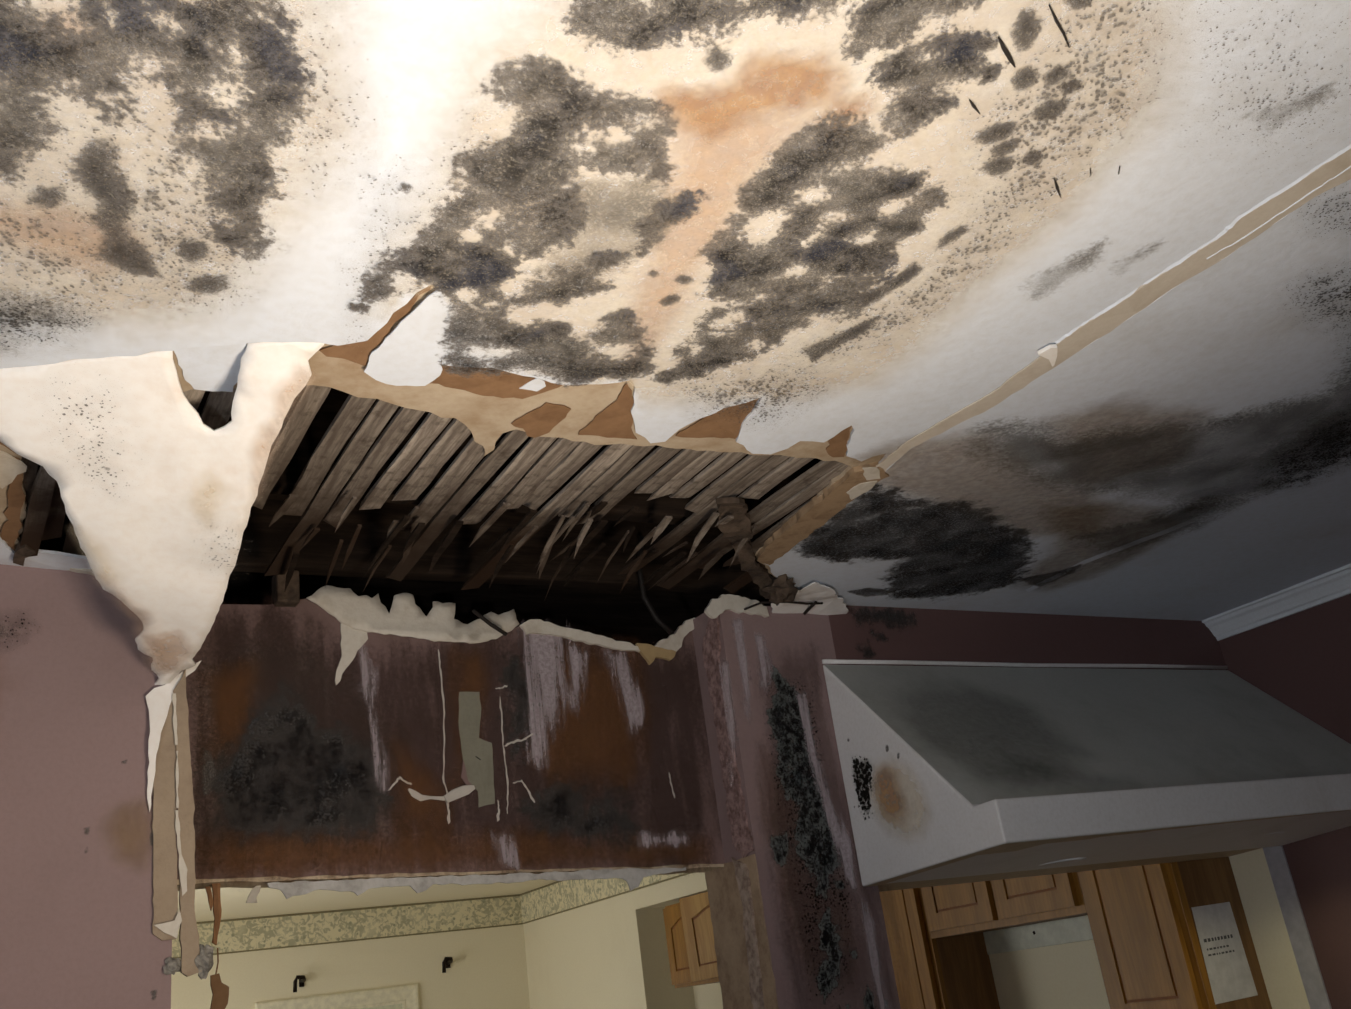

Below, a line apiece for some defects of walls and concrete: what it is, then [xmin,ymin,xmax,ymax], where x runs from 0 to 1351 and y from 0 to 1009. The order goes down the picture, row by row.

damp [0,0,1184,425]
peeling [364,289,450,386]
peeling [519,378,546,391]
damp [983,259,1351,549]
spalling [222,572,273,605]
flaking render [756,462,889,565]
mould [795,484,1081,658]
damp [499,631,587,767]
efflorescence [610,652,644,733]
spalling [152,670,214,980]
spalling [267,575,779,1009]
damp [719,619,889,1009]